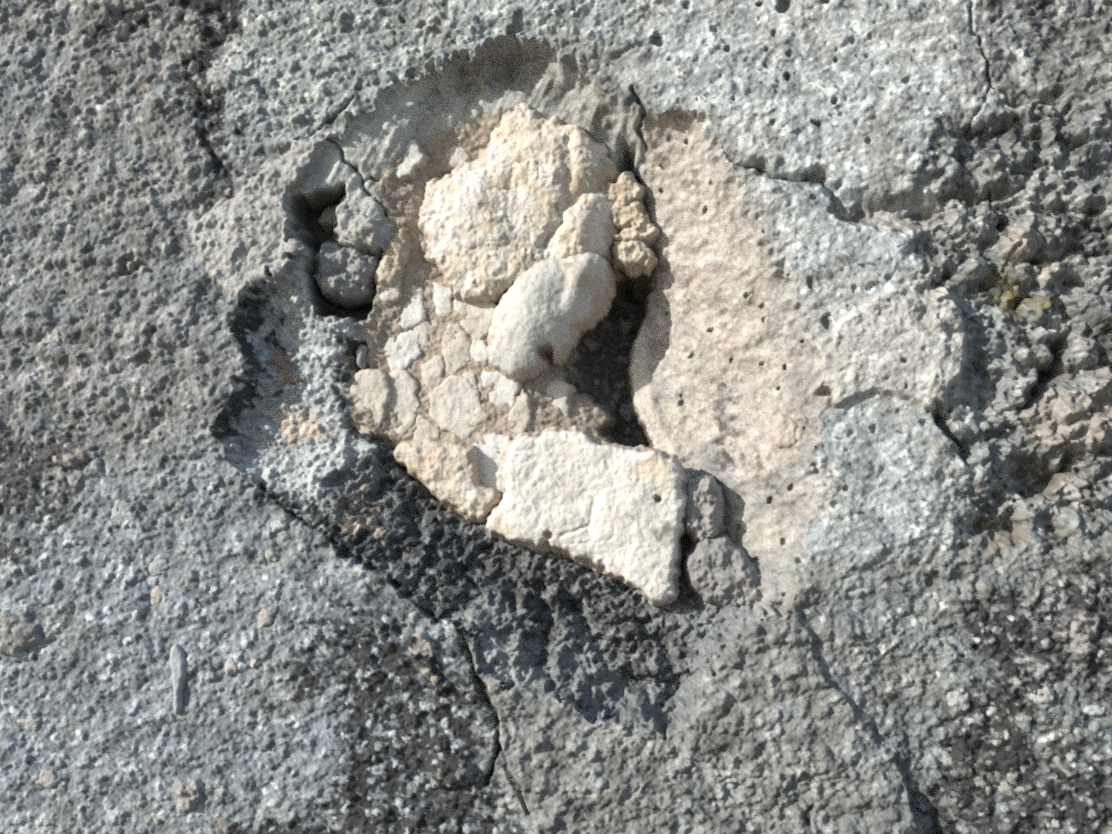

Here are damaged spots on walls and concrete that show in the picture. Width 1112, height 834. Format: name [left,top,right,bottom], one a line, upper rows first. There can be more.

crack [270,494,525,804]
spalling [190,29,969,834]